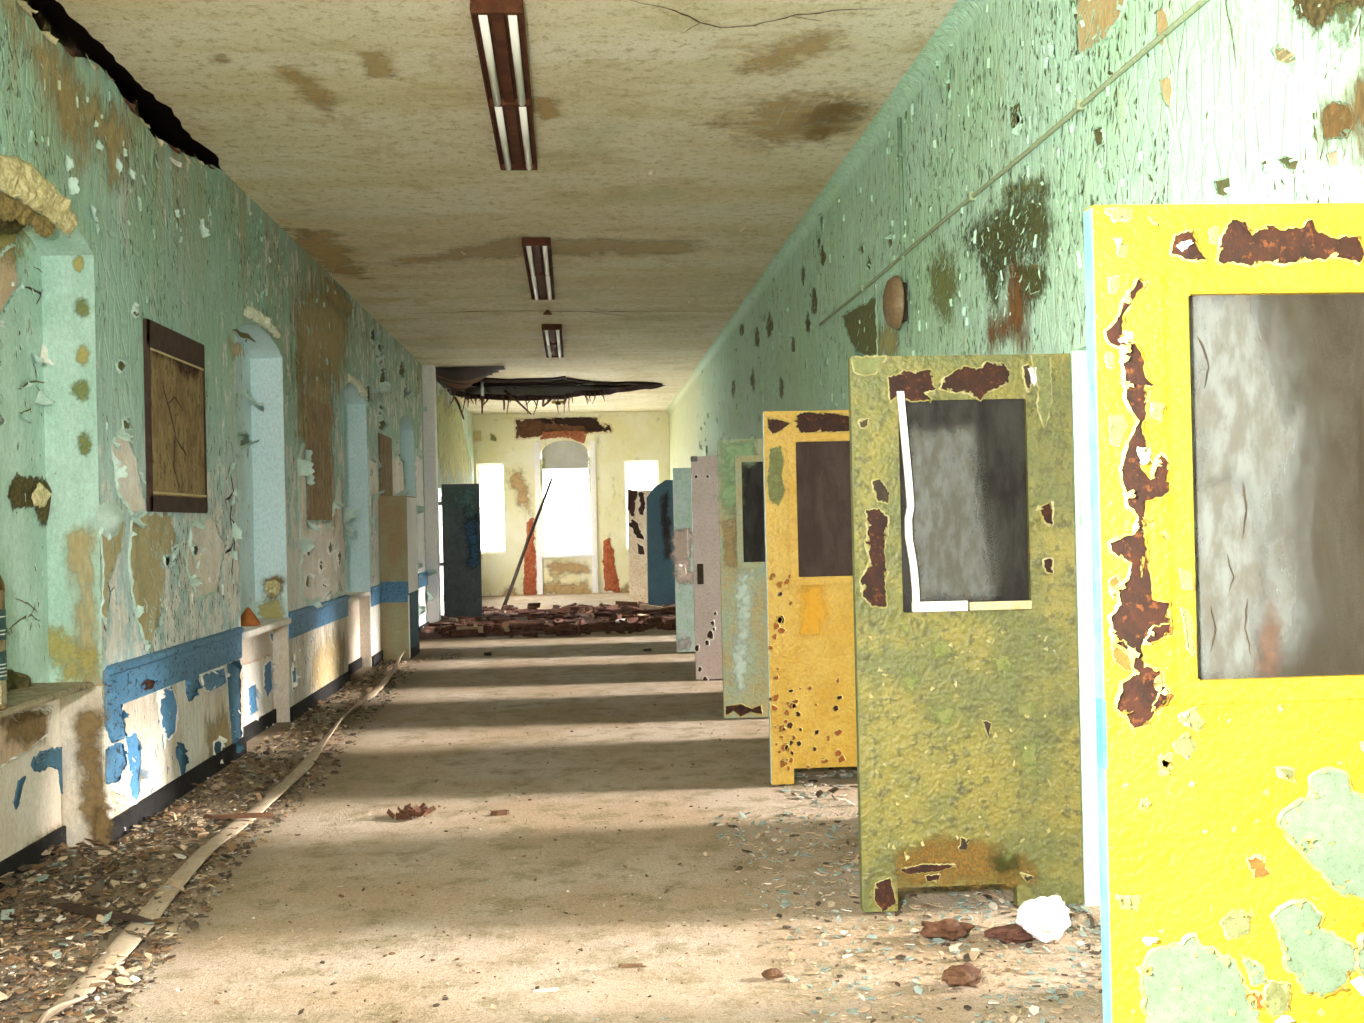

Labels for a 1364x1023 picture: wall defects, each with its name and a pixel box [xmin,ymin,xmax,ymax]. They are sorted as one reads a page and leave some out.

crack [631,0,861,32]
leakage [1293,0,1364,47]
leakage [715,94,868,142]
flaking render [697,0,1175,456]
leakage [928,172,1052,323]
leakage [287,228,364,443]
flaking render [0,0,437,831]
rust [768,573,793,650]
rust [725,667,846,771]
peeling [1158,706,1206,777]
peeling [1275,766,1364,900]
peeling [1134,897,1364,1023]